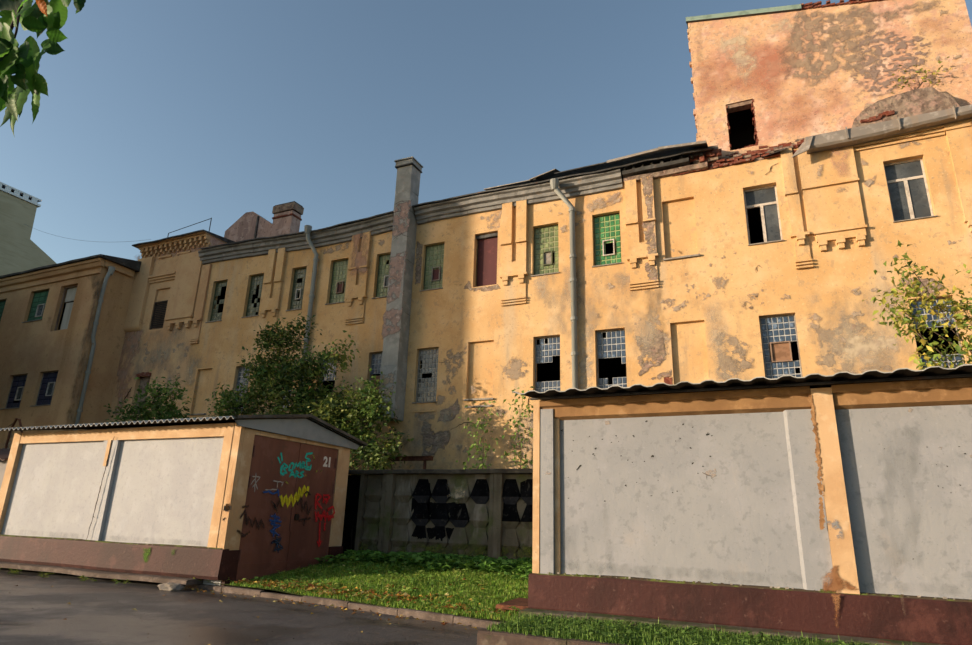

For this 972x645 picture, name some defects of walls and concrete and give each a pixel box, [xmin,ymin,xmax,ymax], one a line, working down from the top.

flaking render [382,251,406,339]
spalling [415,348,466,456]
peeling [503,359,527,379]
spalling [636,273,728,385]
peeling [715,333,754,379]
peeling [808,276,890,374]
peeling [808,394,826,530]
rust [823,566,857,617]